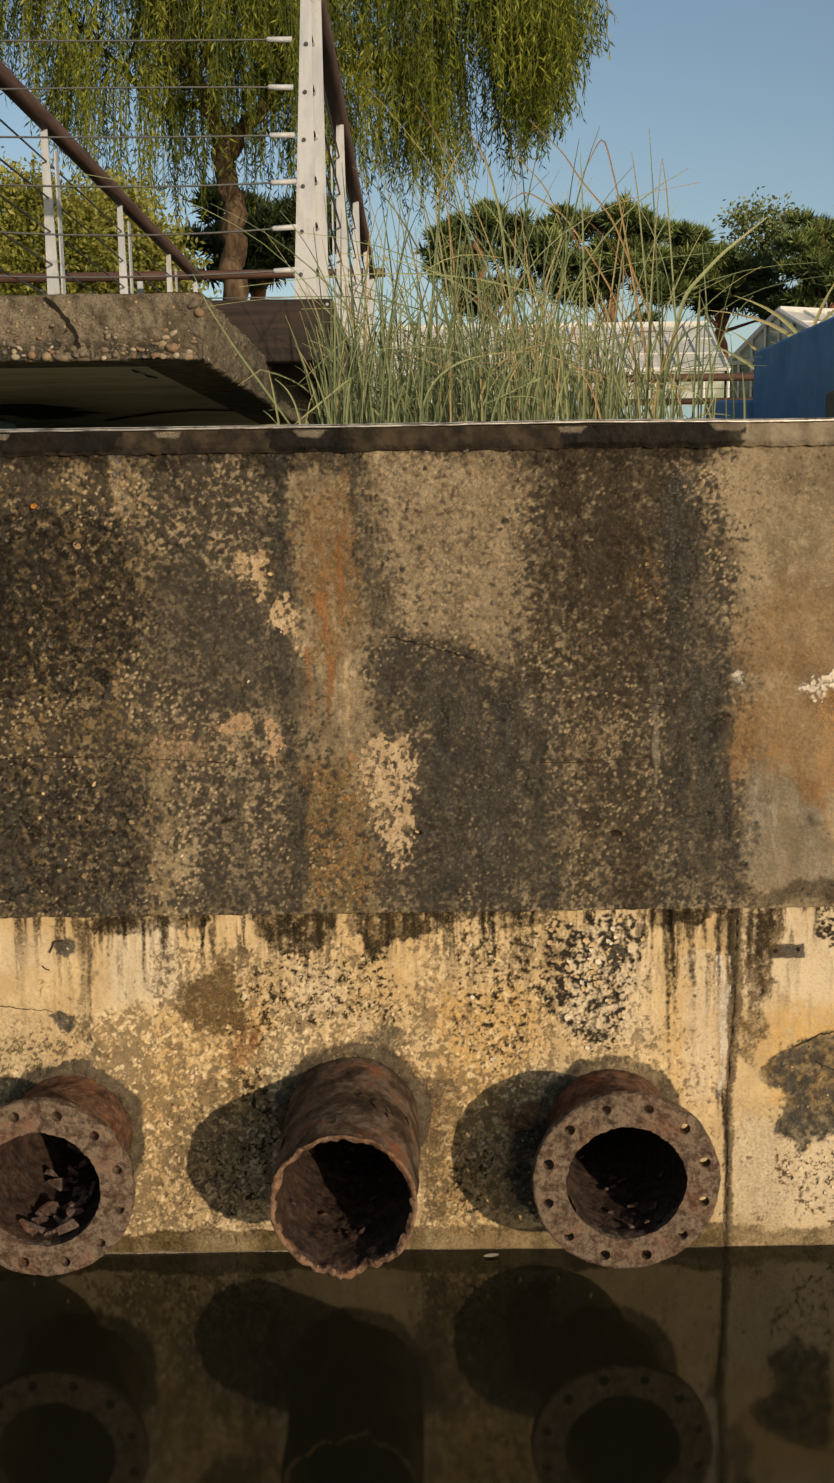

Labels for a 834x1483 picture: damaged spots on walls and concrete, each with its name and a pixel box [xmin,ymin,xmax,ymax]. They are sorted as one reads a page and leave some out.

rust [288,469,369,713]
damp [0,423,834,1246]